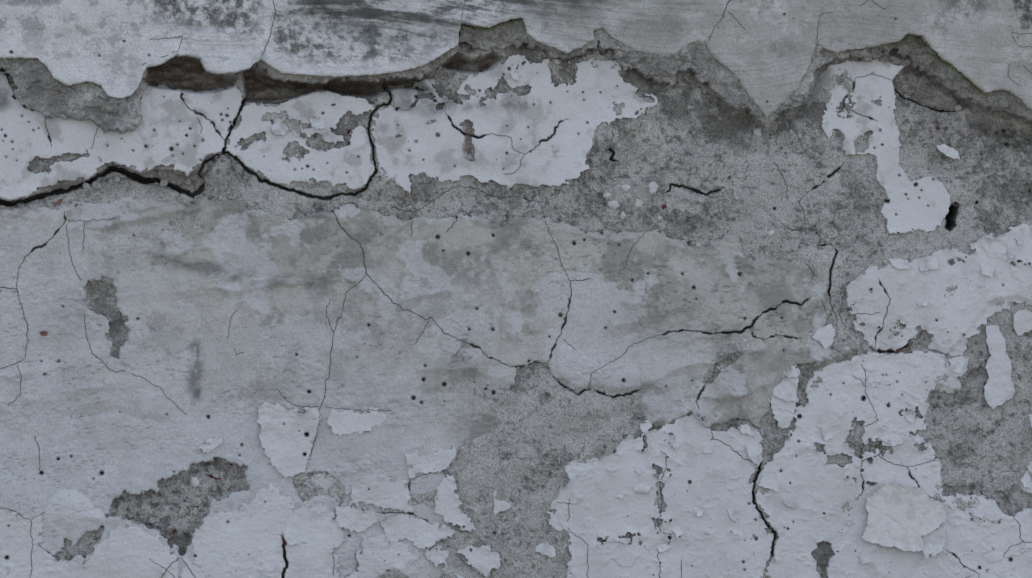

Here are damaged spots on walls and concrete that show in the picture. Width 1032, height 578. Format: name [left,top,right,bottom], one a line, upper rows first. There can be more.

crack [0,508,44,576]
crack [280,537,288,578]
crack [0,82,946,501]
spalling [0,18,1032,356]
peeling [110,223,1032,578]
crack [696,365,777,562]